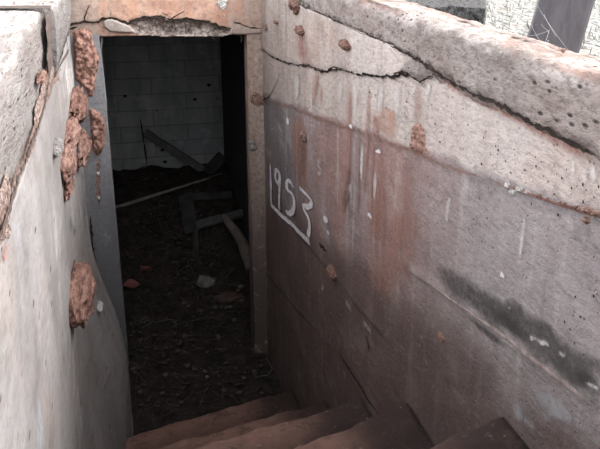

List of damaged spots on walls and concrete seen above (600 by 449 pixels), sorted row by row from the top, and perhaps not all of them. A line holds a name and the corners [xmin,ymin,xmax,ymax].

spalling [103,15,261,37]
crack [261,0,593,155]
rust [521,190,597,215]
leakage [443,270,598,391]